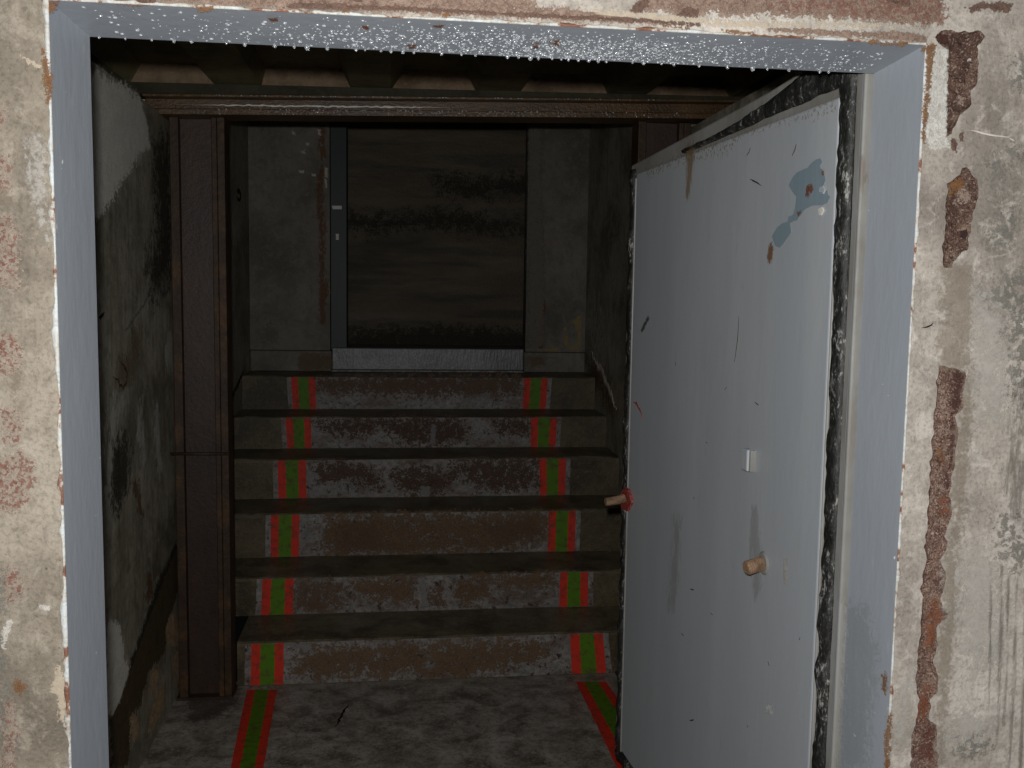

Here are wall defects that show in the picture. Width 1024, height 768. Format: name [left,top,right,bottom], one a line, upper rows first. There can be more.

spalling [116,0,985,153]
peeling [767,158,830,264]
spalling [942,167,978,268]
spalling [910,365,966,768]